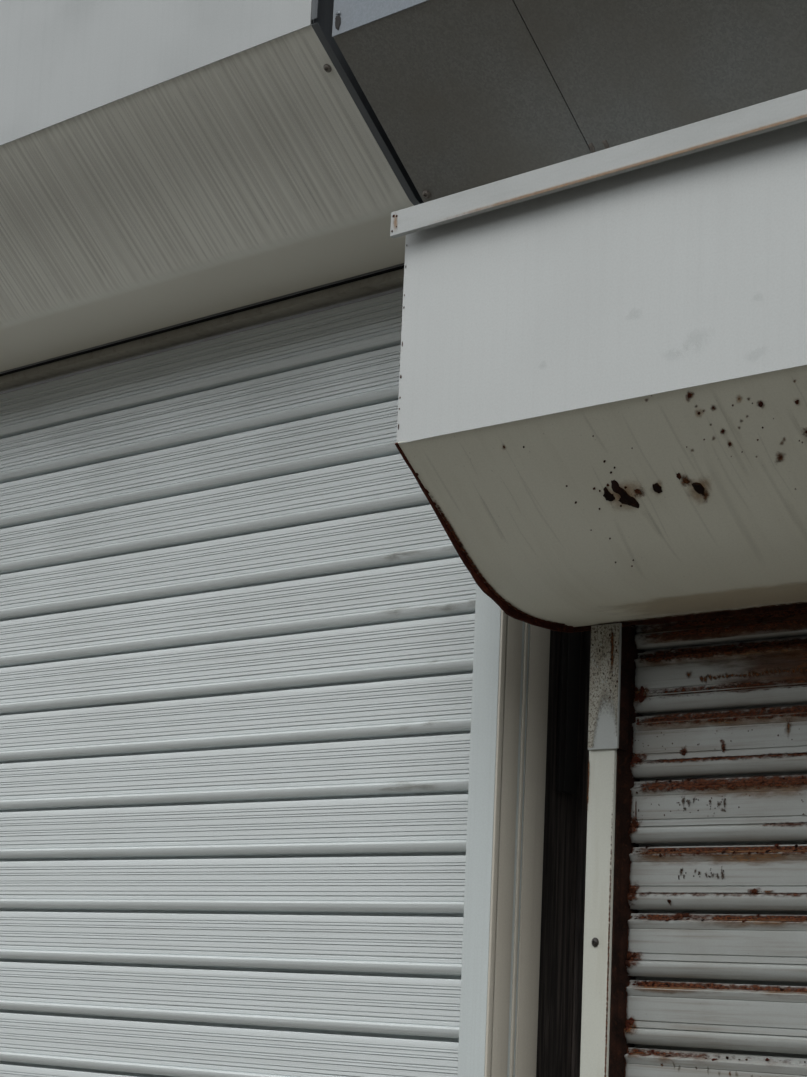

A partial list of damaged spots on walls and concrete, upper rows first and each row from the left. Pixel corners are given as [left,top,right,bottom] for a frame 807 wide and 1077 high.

corrosion [593,460,643,510]
corrosion [676,473,709,501]
corrosion [425,489,573,627]
corrosion [603,602,807,1077]